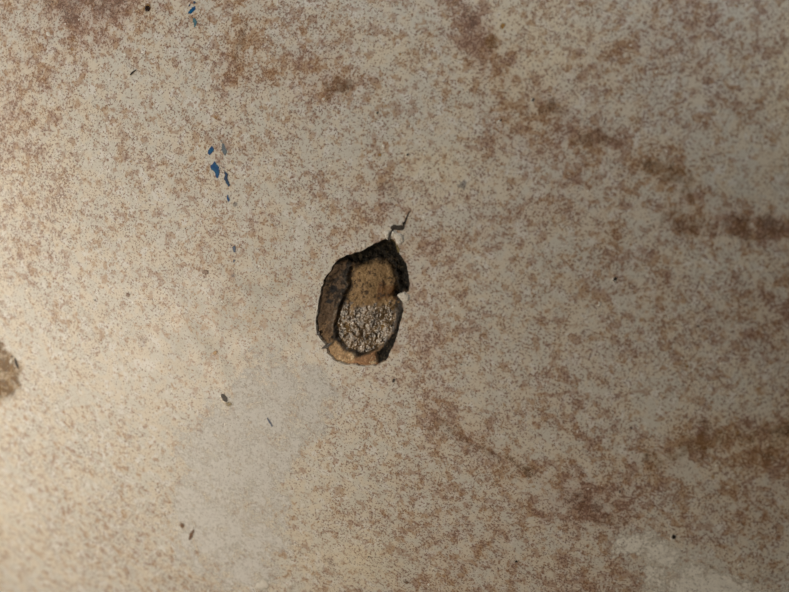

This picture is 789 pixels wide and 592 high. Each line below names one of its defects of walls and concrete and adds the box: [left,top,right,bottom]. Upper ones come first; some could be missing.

water stain [0,343,21,397]